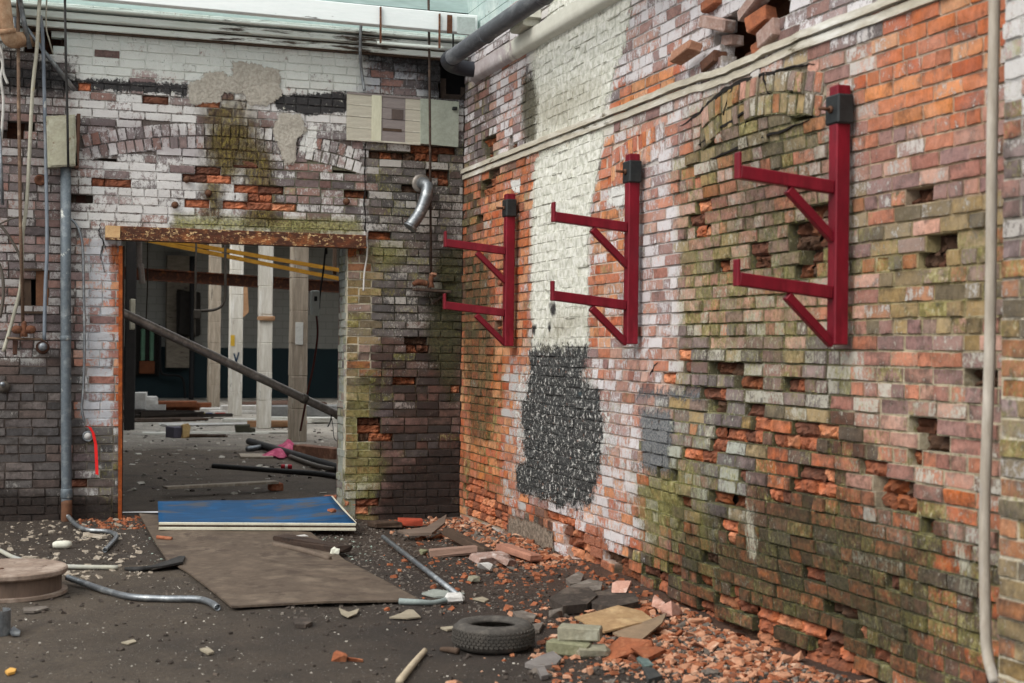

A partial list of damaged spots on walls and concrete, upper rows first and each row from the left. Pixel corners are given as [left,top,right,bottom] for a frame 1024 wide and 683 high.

crack [680,63,815,159]
leakage [206,127,274,225]
peeling [465,0,879,680]
spalling [357,417,392,442]
spalling [915,417,950,465]
leakage [383,448,460,520]
spalling [865,459,917,513]
leakage [745,506,758,559]
leakage [945,519,970,580]